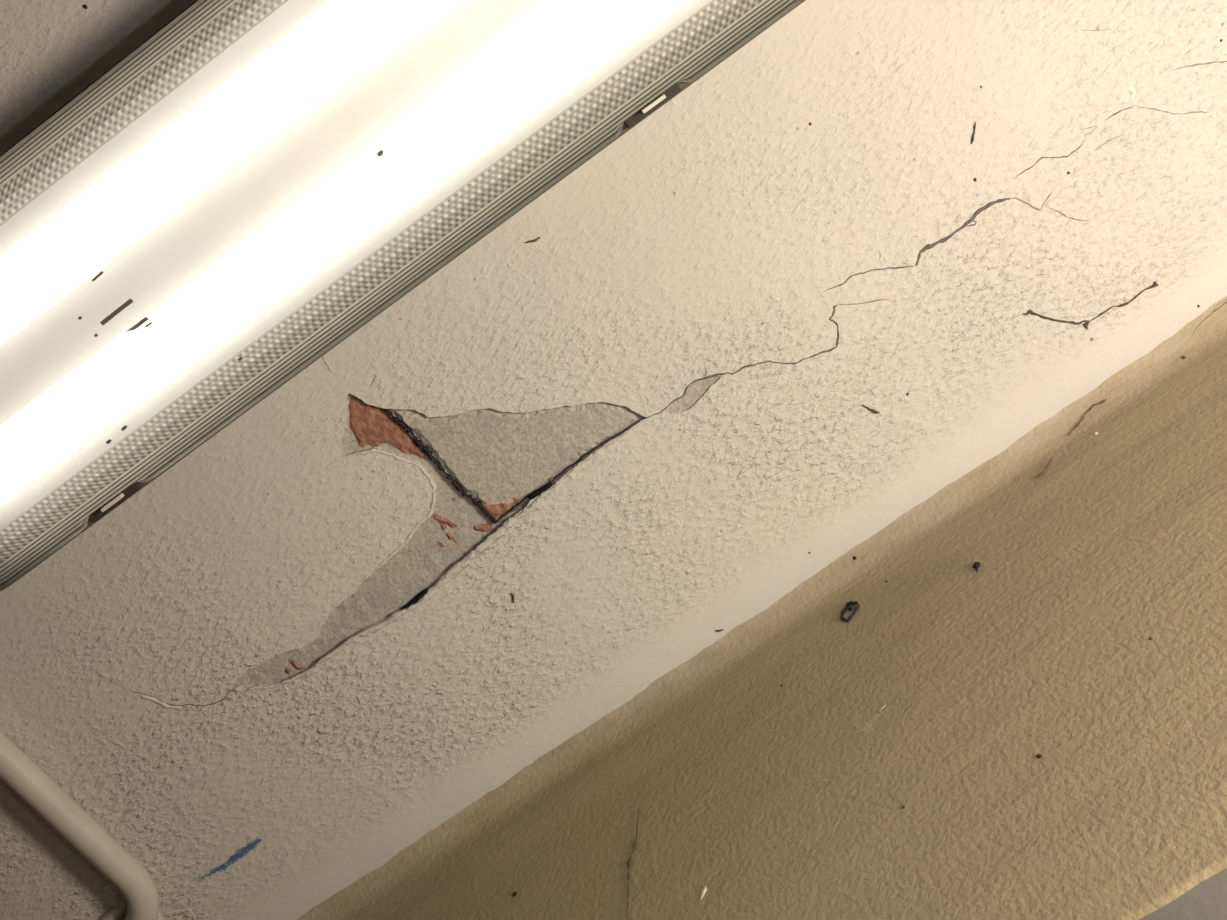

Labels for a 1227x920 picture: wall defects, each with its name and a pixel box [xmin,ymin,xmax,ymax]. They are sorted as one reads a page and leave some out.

crack [1169,61,1227,72]
crack [644,87,1208,419]
flaking render [231,393,648,692]